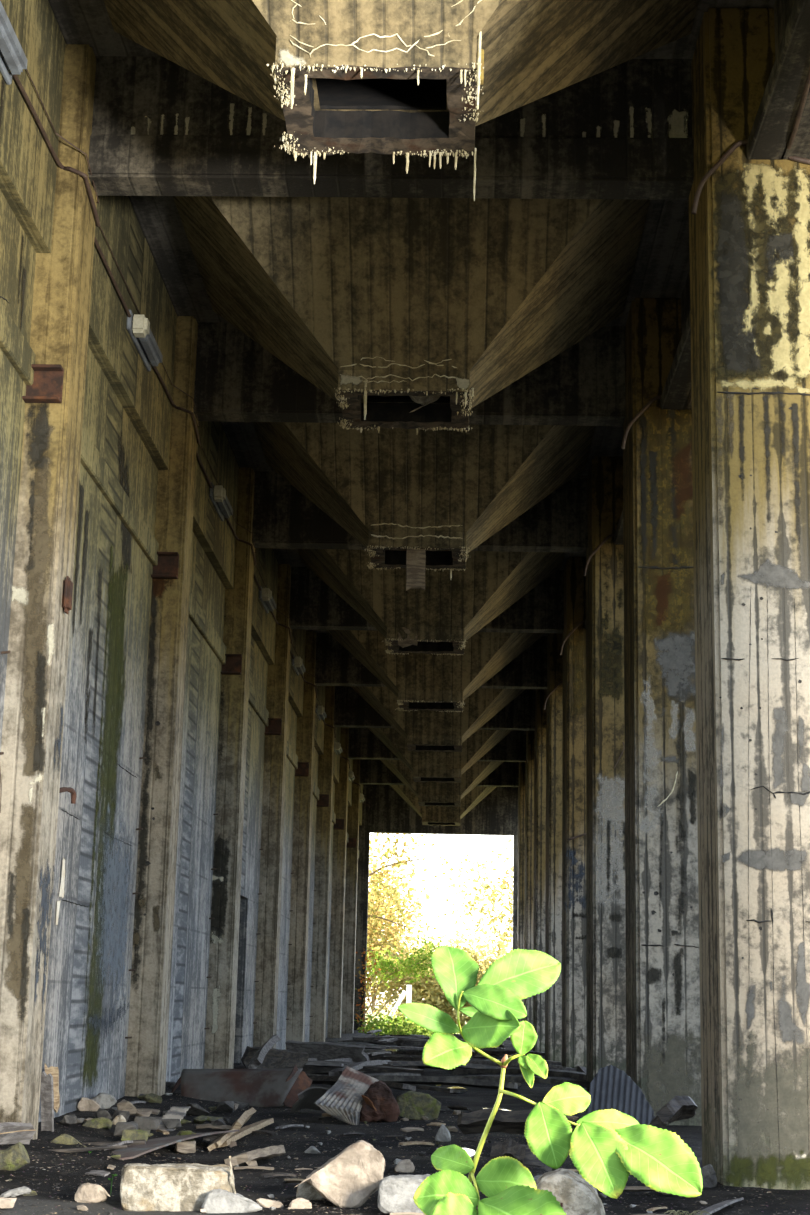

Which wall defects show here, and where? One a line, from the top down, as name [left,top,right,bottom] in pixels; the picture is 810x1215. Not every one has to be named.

damp [266,31,484,122]
damp [131,114,190,135]
damp [229,103,267,135]
damp [274,131,349,184]
damp [393,148,476,201]
peeling [721,164,810,393]
damp [334,375,474,434]
damp [118,431,129,497]
damp [4,426,63,1029]
damp [73,485,162,1042]